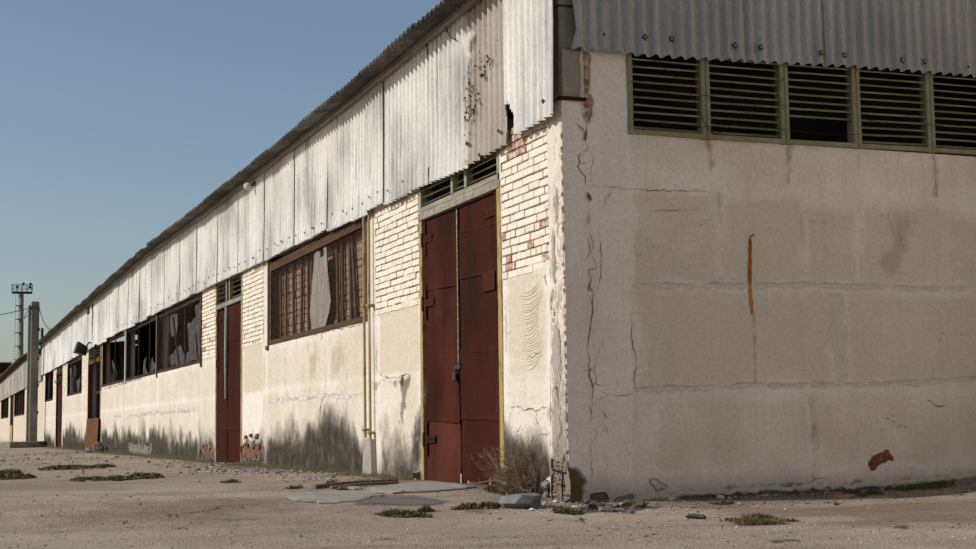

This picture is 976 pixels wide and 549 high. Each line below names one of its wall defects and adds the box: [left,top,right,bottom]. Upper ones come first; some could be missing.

flaking render [579,48,595,142]
crack [577,113,719,210]
crack [585,233,637,476]
water stain [101,430,213,461]
water stain [245,410,363,474]